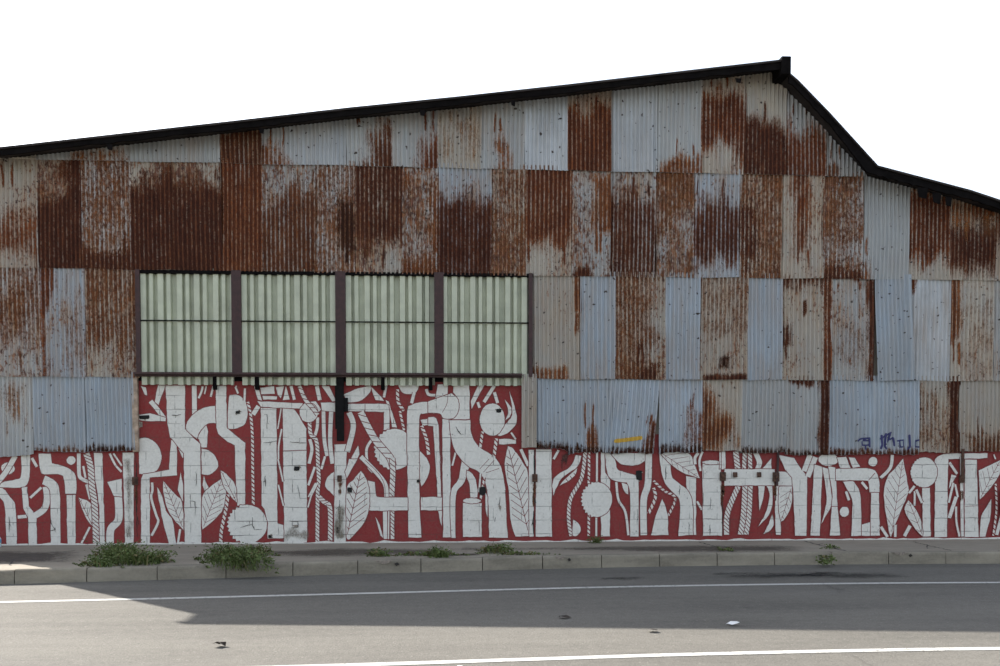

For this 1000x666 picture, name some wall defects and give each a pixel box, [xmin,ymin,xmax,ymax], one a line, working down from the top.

corrosion [0,77,1000,456]